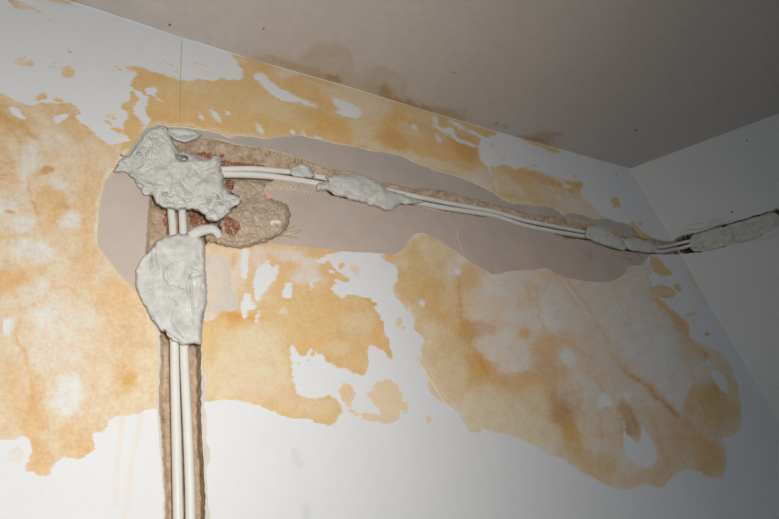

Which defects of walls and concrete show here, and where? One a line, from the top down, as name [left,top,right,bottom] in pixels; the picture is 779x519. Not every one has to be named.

flaking render [97,165,166,519]
flaking render [200,344,210,519]
damp [0,37,651,519]
flaking render [124,124,676,243]
flaking render [255,180,677,282]
damp [202,233,744,492]